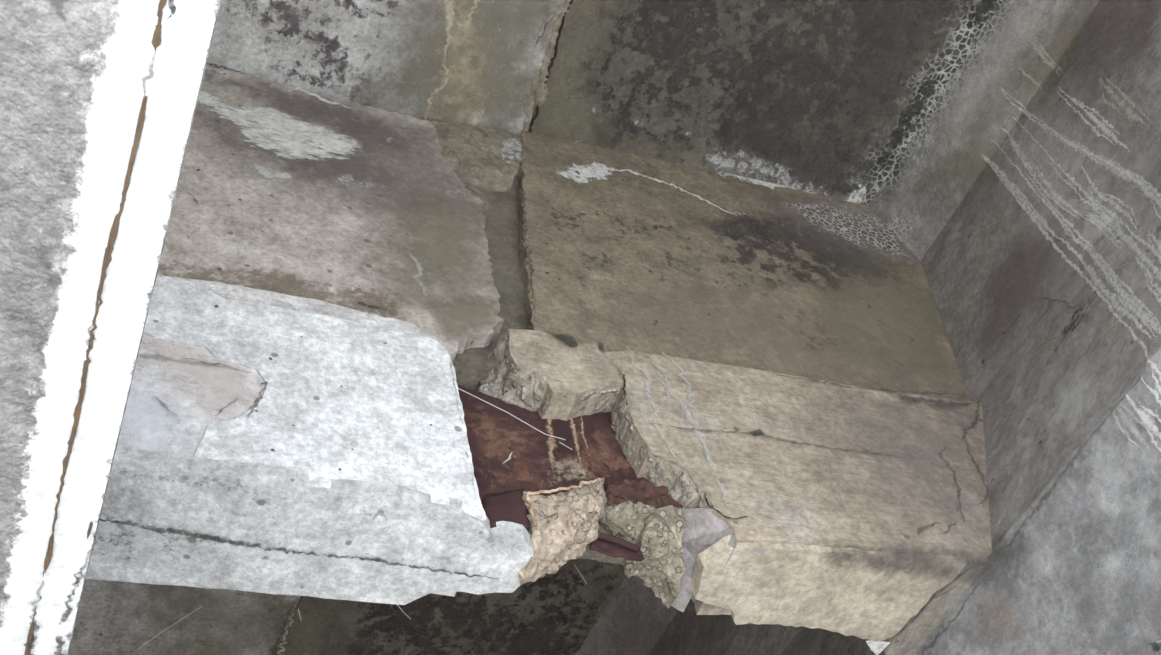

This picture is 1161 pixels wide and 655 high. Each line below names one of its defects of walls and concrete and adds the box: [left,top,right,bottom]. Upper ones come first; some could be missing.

leakage [198,0,489,207]
leakage [550,0,1161,453]
crack [25,0,166,655]
crack [218,382,267,414]
peeling [159,261,397,316]
spalling [477,328,567,416]
spalling [553,333,578,347]
rust [476,415,629,528]
spalling [518,388,760,612]
crack [703,491,755,519]
crack [74,518,499,596]
leakage [261,565,611,655]